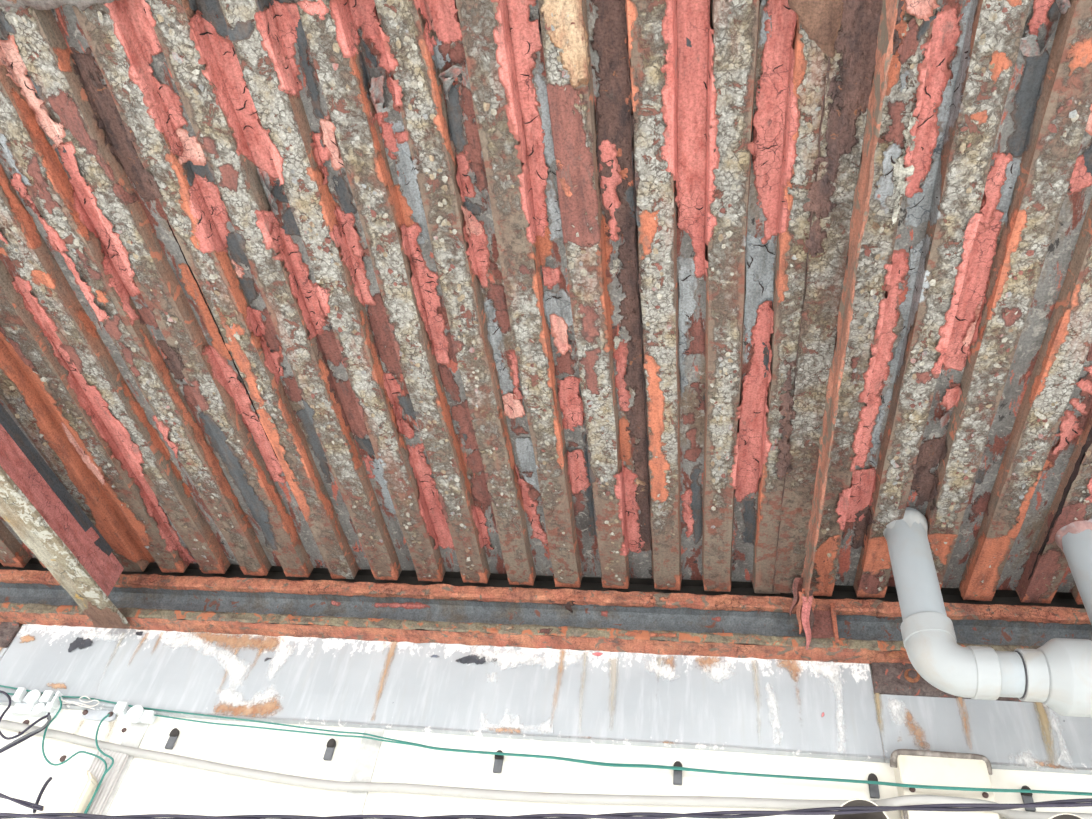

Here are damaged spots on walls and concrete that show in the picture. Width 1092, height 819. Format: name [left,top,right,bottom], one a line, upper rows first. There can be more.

peeling [0,6,178,326]
peeling [83,0,494,578]
peeling [483,0,575,244]
peeling [660,0,733,278]
peeling [821,185,962,534]
peeling [910,0,1061,384]
rust [194,632,280,655]
rust [214,697,280,717]
rust [371,561,399,580]
rust [377,642,397,700]
rust [460,568,488,584]
rust [550,574,581,613]